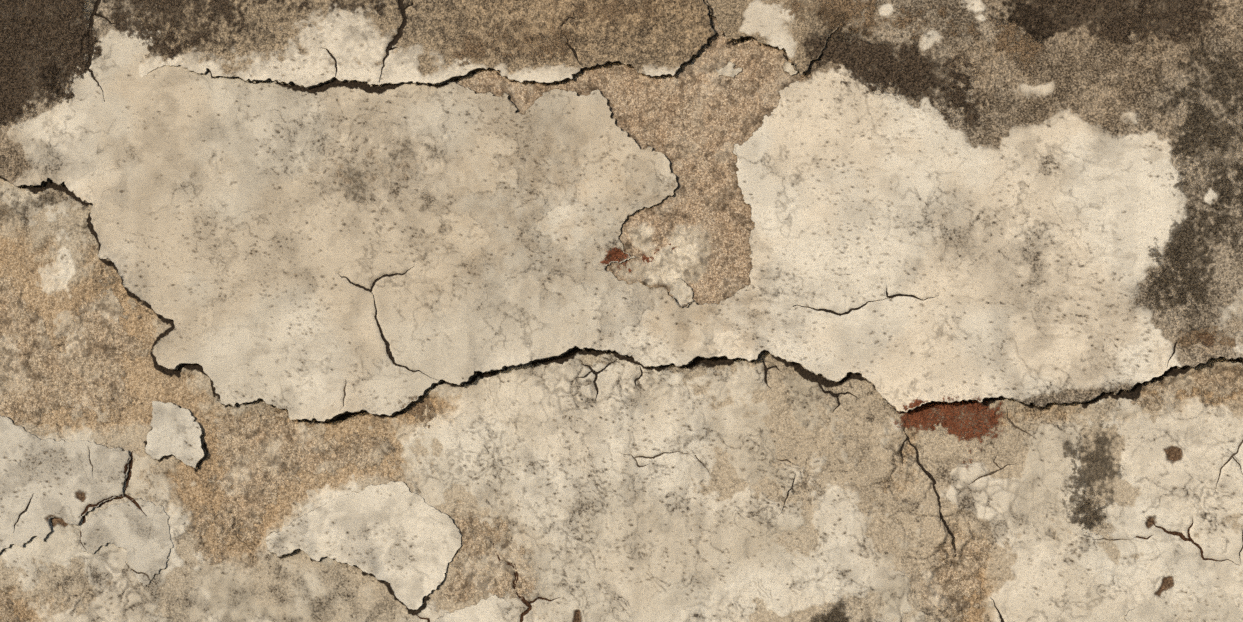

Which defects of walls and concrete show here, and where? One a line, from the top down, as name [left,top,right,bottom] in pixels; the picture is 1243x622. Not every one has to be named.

damp [0,0,408,125]
crack [206,0,593,95]
damp [778,0,990,131]
flaking render [0,0,1243,426]
rust [600,244,675,272]
damp [989,0,1243,316]
spalling [0,275,173,587]
flaking render [144,401,205,469]
spalling [193,409,395,565]
crack [0,176,1243,566]
rust [895,396,1004,468]
crack [493,543,578,622]